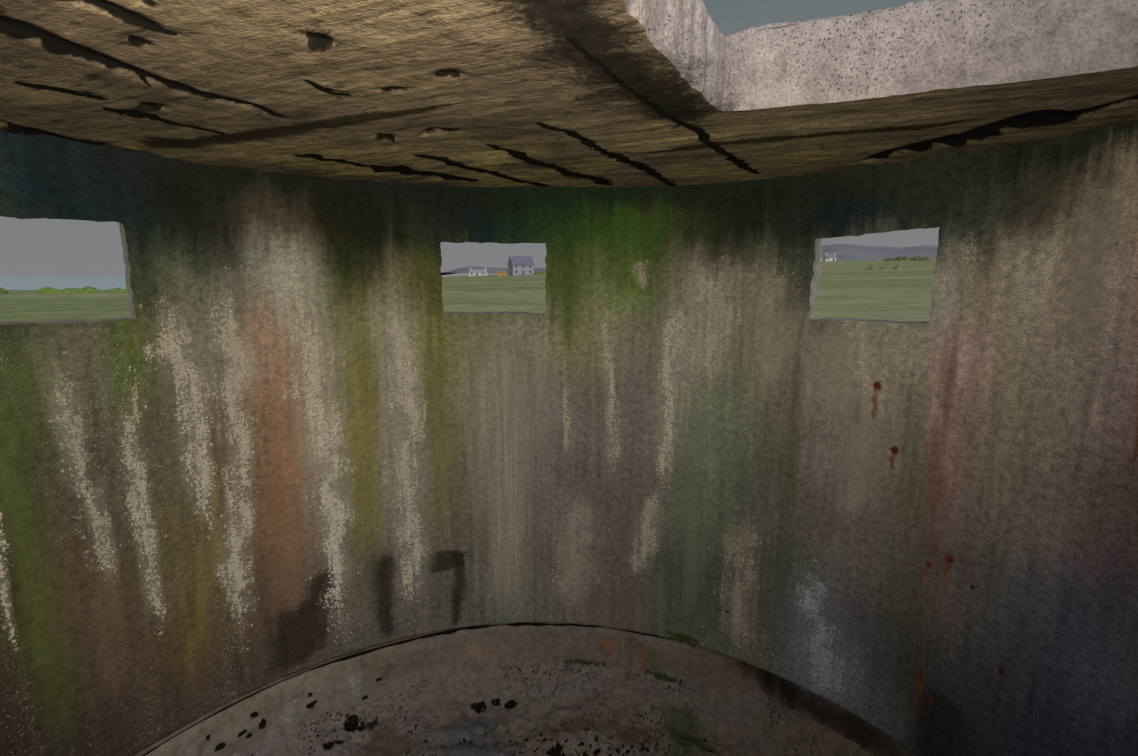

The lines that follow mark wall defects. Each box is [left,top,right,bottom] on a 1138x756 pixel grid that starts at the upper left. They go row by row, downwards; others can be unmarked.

crack [60,0,178,35]
crack [0,15,288,135]
crack [293,122,677,187]
leakage [487,0,730,126]
crack [863,94,1138,160]
leakage [541,256,801,614]
efflorescence [0,512,19,651]